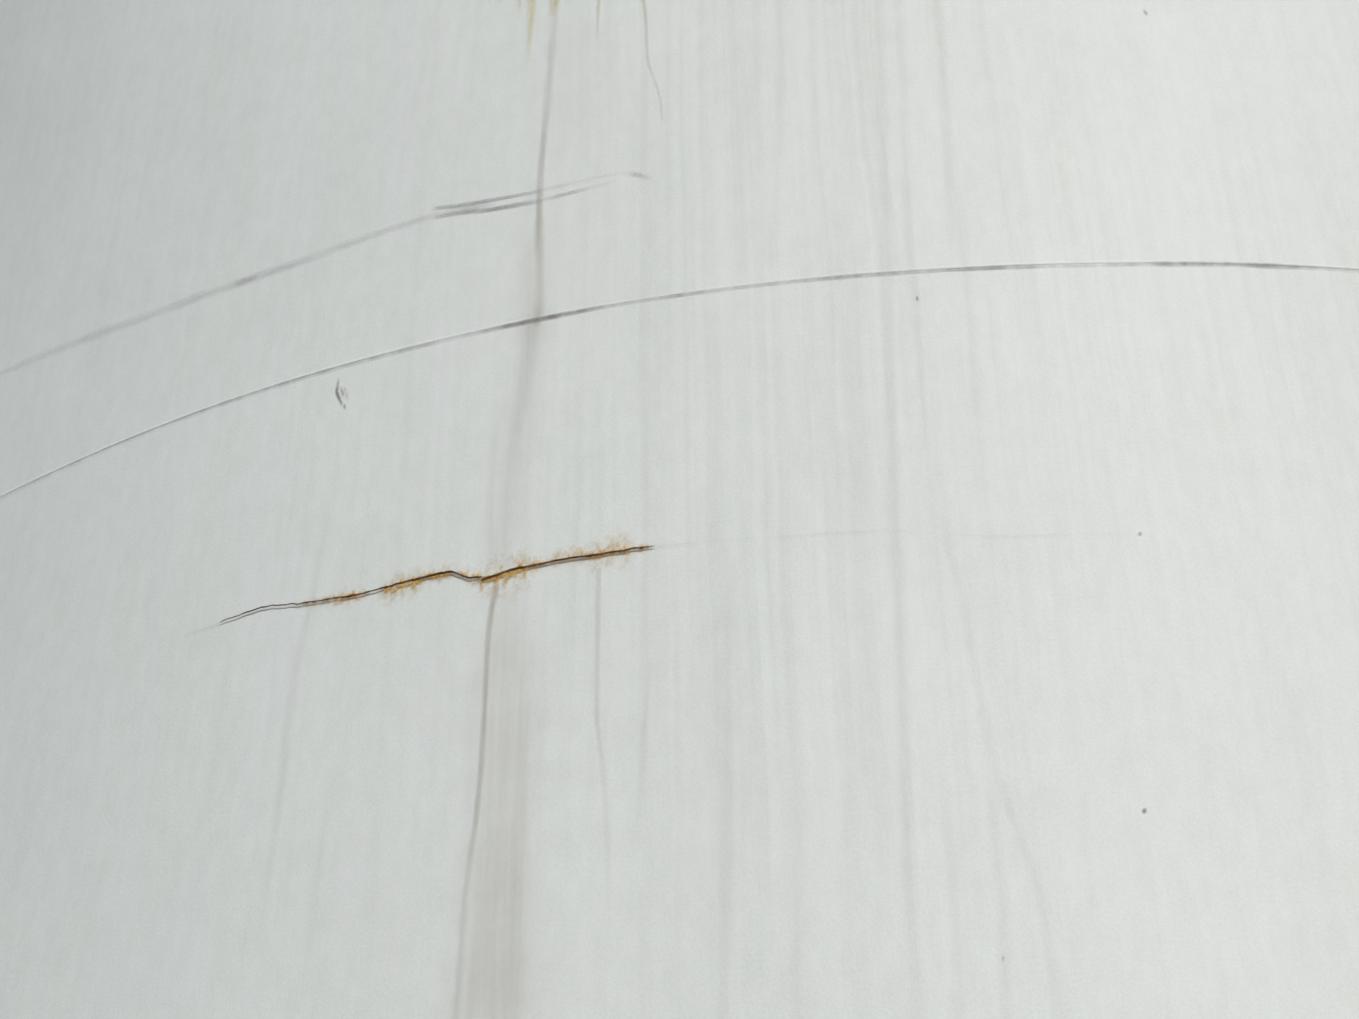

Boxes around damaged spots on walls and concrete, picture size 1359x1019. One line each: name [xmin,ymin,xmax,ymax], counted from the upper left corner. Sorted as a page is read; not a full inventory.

crack [221,546,652,622]